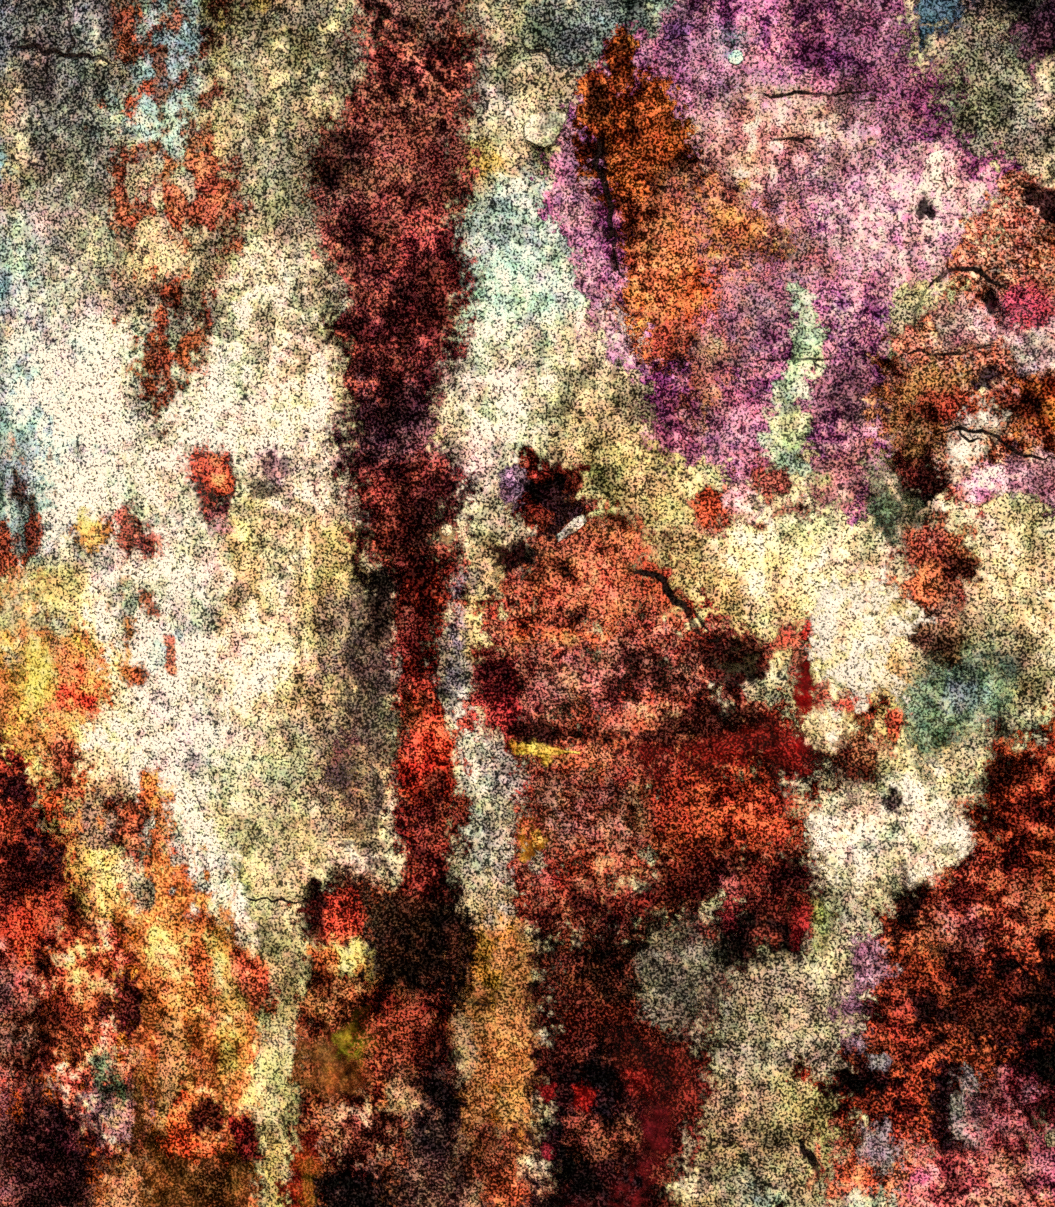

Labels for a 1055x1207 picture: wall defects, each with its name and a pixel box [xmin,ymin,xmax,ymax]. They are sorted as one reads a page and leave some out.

corrosion [107,0,253,438]
corrosion [650,164,724,250]
corrosion [672,305,749,436]
corrosion [301,0,491,903]
corrosion [686,451,817,538]
corrosion [163,634,177,676]
corrosion [767,615,817,686]
corrosion [28,589,160,902]
corrosion [814,680,907,787]
corrosion [8,756,461,1207]